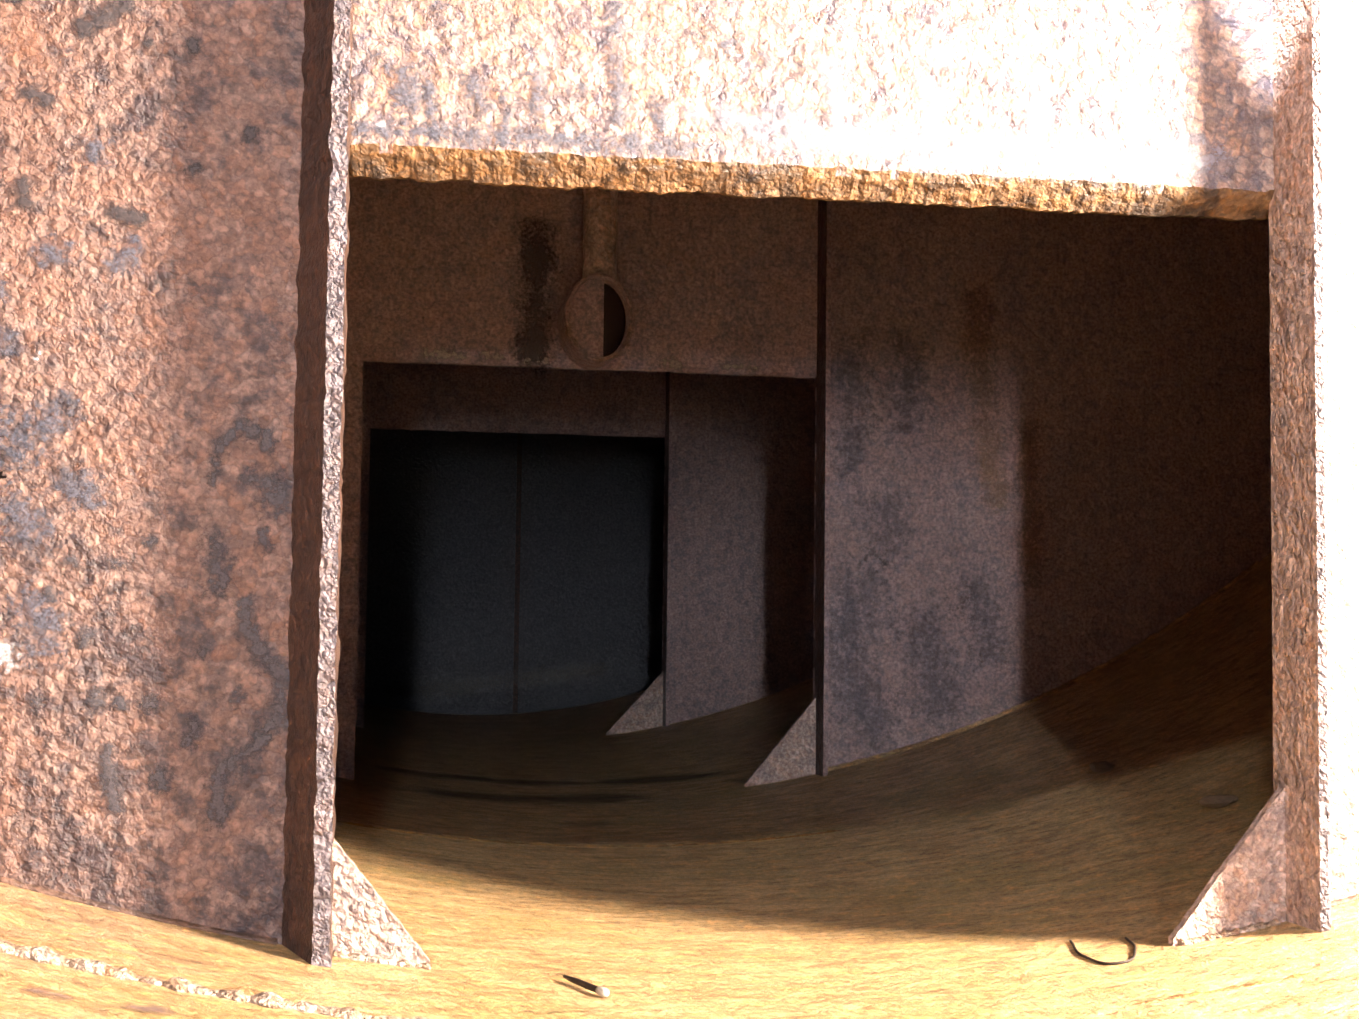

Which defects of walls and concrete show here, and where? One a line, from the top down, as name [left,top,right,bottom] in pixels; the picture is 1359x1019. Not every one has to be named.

leakage [100,234,143,281]
leakage [482,216,559,375]
leakage [0,390,80,562]
leakage [50,468,106,517]
leakage [0,580,70,667]